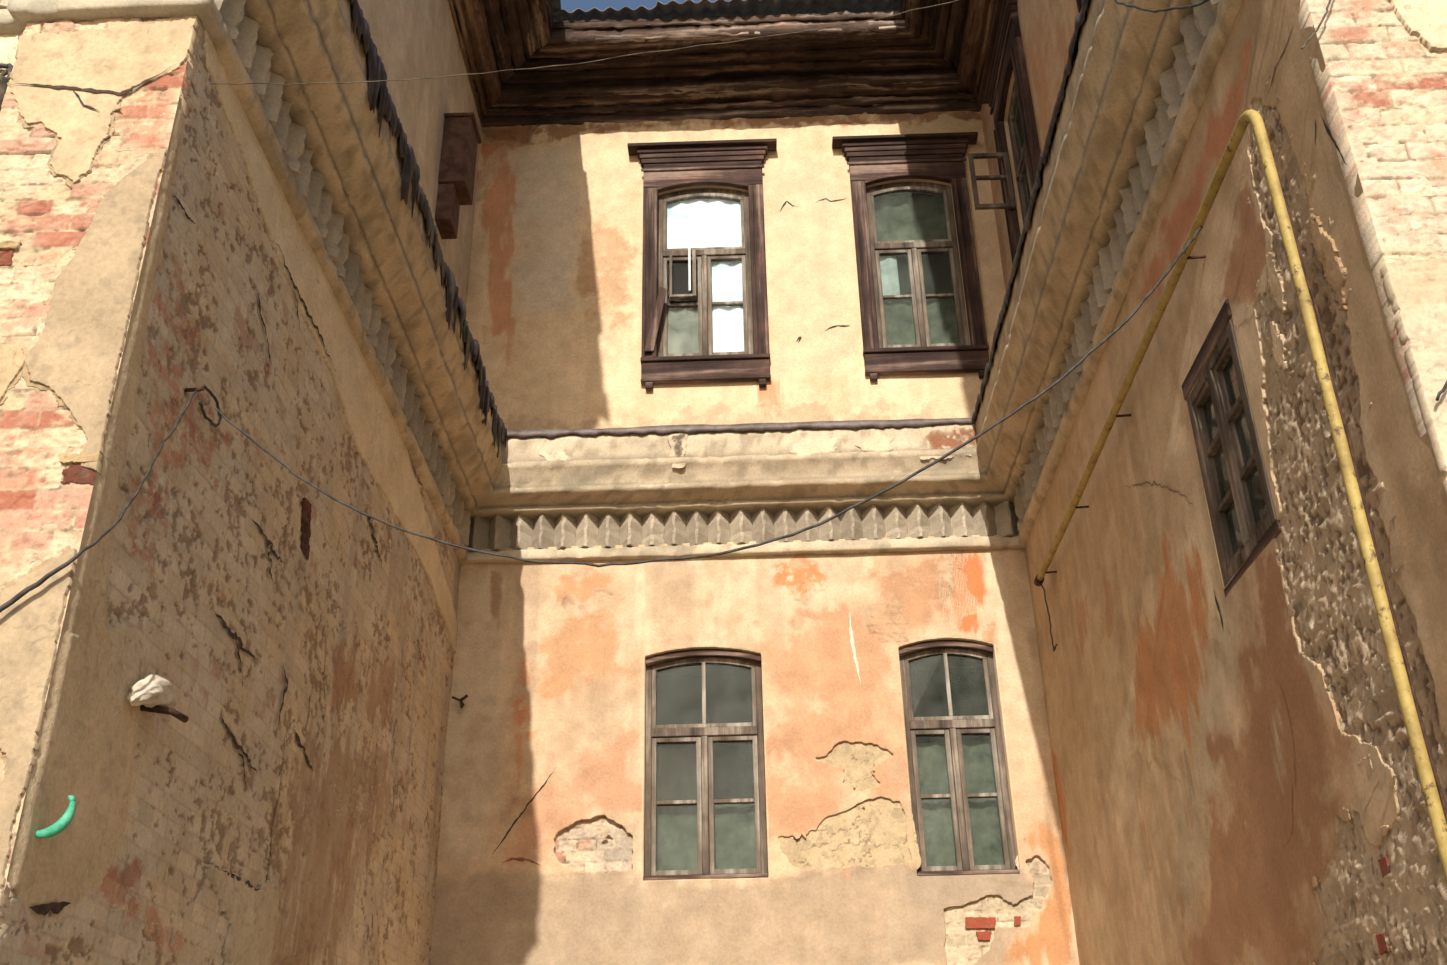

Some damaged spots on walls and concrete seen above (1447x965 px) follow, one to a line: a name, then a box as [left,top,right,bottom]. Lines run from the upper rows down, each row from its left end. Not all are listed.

crack [10,64,176,112]
flaking render [1306,0,1447,123]
crack [1315,116,1347,165]
peeling [0,18,458,965]
crack [1121,481,1200,509]
spalling [1247,78,1447,965]
crack [493,767,556,866]
spalling [554,816,633,874]
spalling [944,856,1052,965]